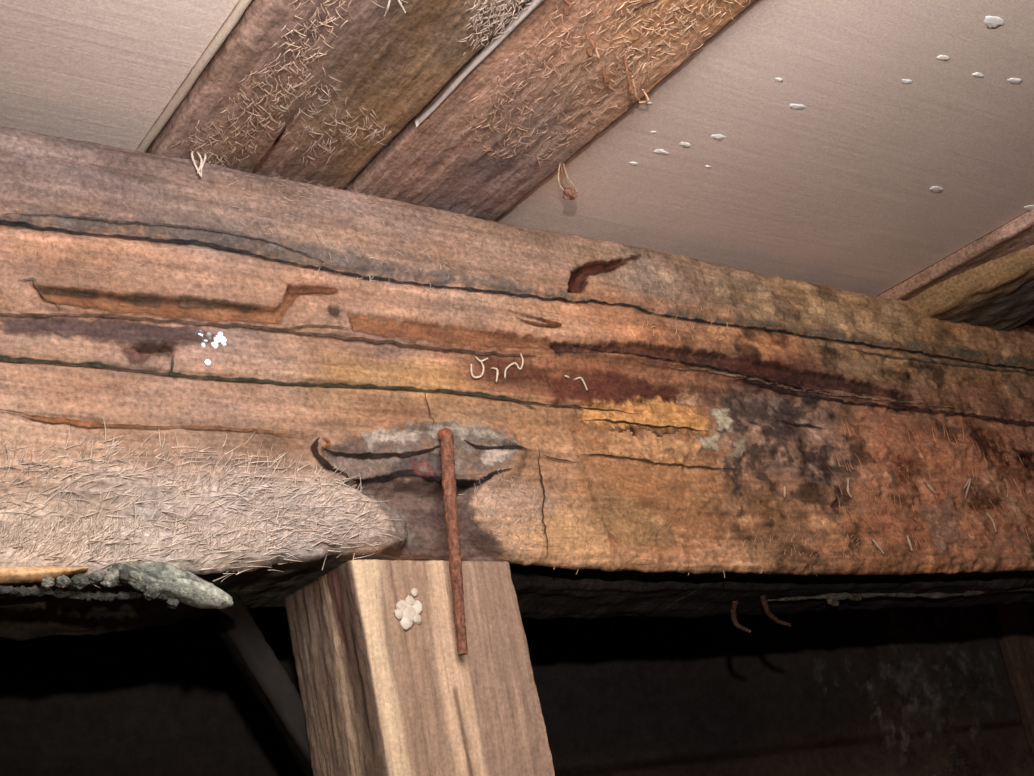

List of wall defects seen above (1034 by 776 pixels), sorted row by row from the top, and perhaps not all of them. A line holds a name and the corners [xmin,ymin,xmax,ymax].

water stain [3,212,590,303]
water stain [719,394,849,513]
water stain [761,591,1034,776]